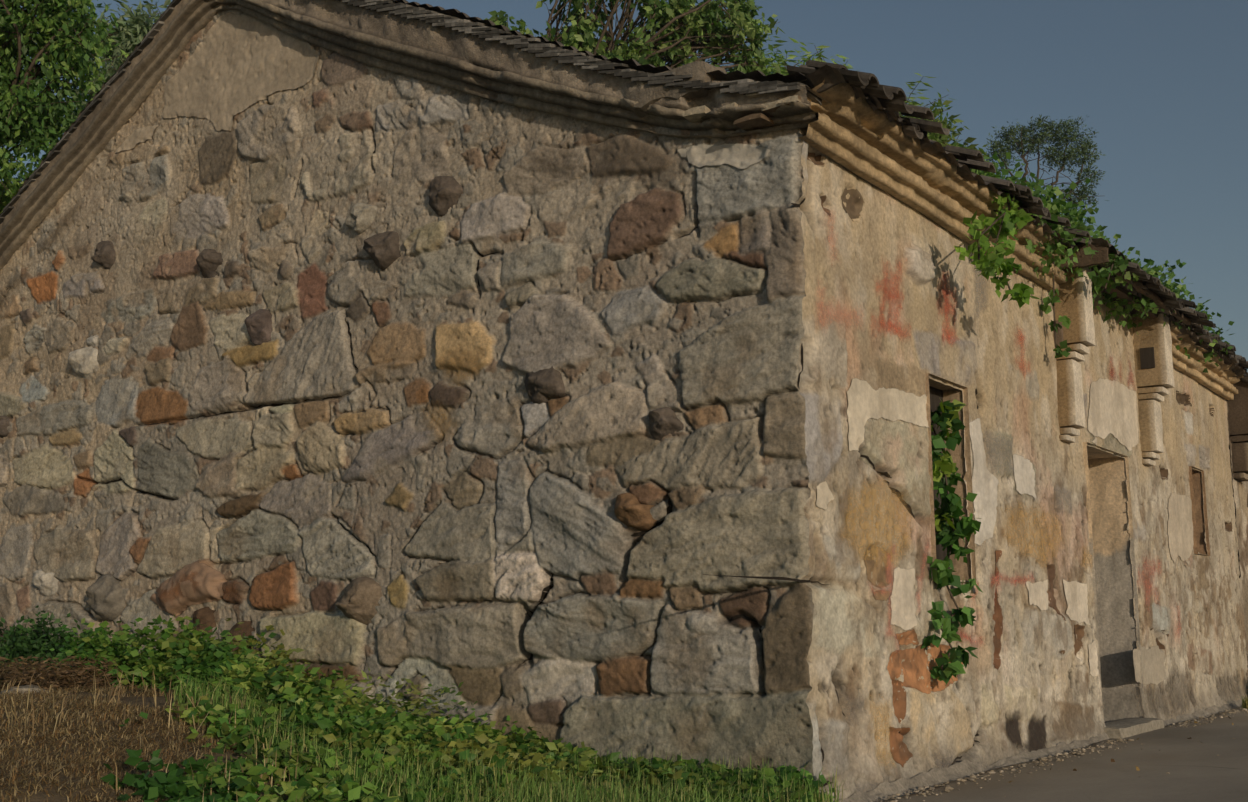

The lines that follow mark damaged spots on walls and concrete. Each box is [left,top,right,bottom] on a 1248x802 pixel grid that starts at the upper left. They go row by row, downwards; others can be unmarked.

flaking render [847,378,929,451]
flaking render [816,481,834,510]
flaking render [969,418,1003,670]
flaking render [1013,454,1036,501]
spalling [863,544,963,767]
flaking render [1025,564,1099,677]